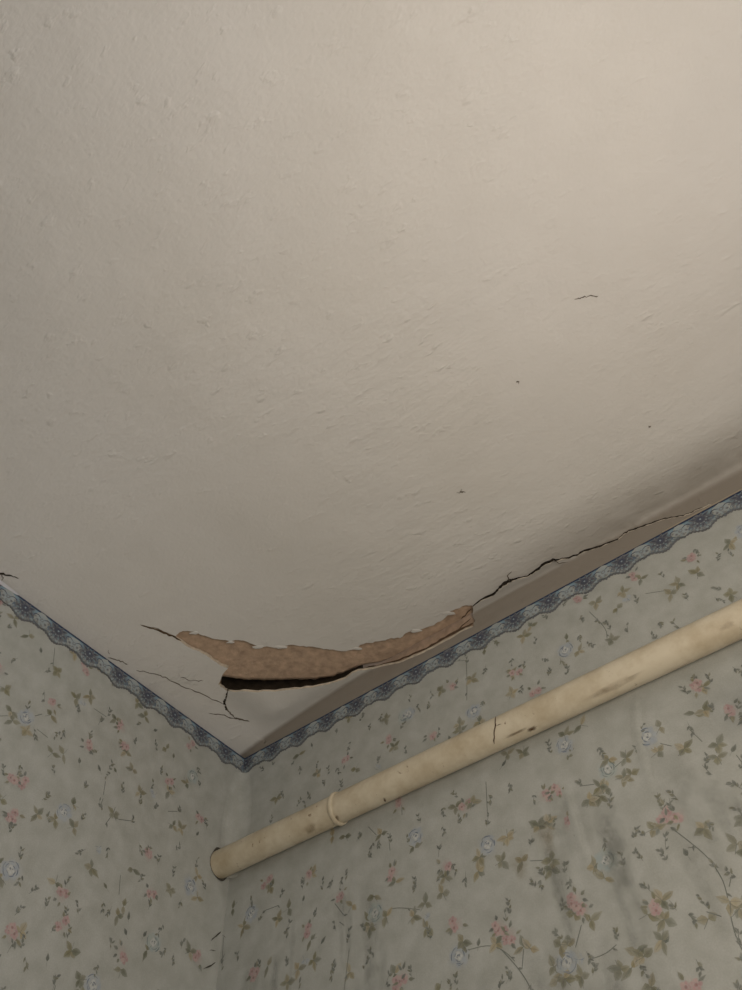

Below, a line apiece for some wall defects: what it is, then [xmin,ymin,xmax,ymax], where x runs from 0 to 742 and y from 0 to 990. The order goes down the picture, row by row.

crack [473,505,707,606]
crack [108,650,250,722]
flaking render [141,605,475,692]